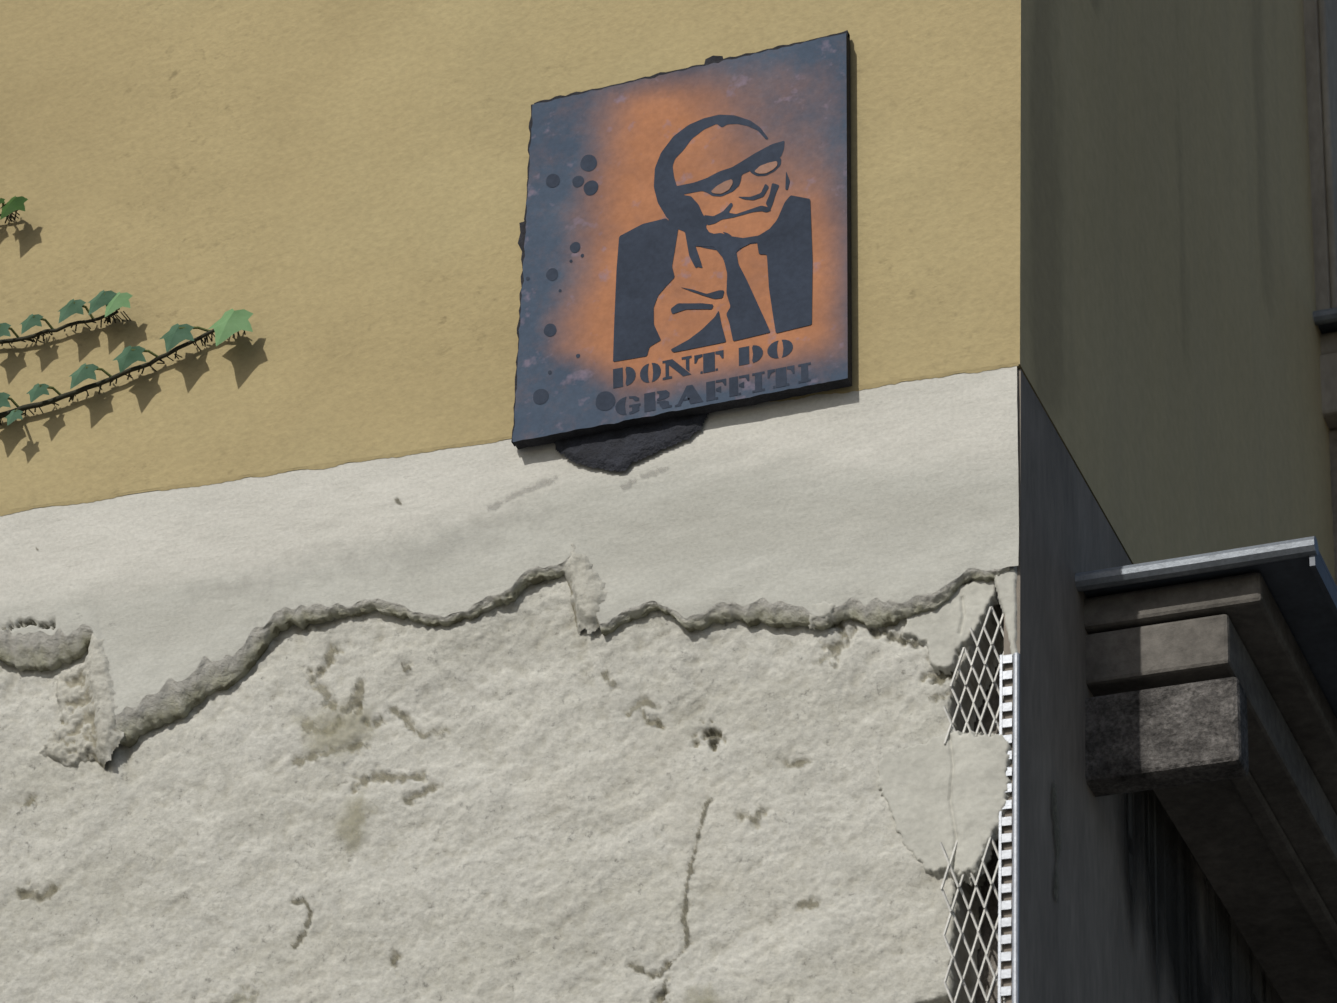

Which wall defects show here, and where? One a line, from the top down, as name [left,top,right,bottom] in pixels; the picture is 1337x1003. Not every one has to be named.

spalling [0,543,1018,1003]
crack [629,800,710,1000]